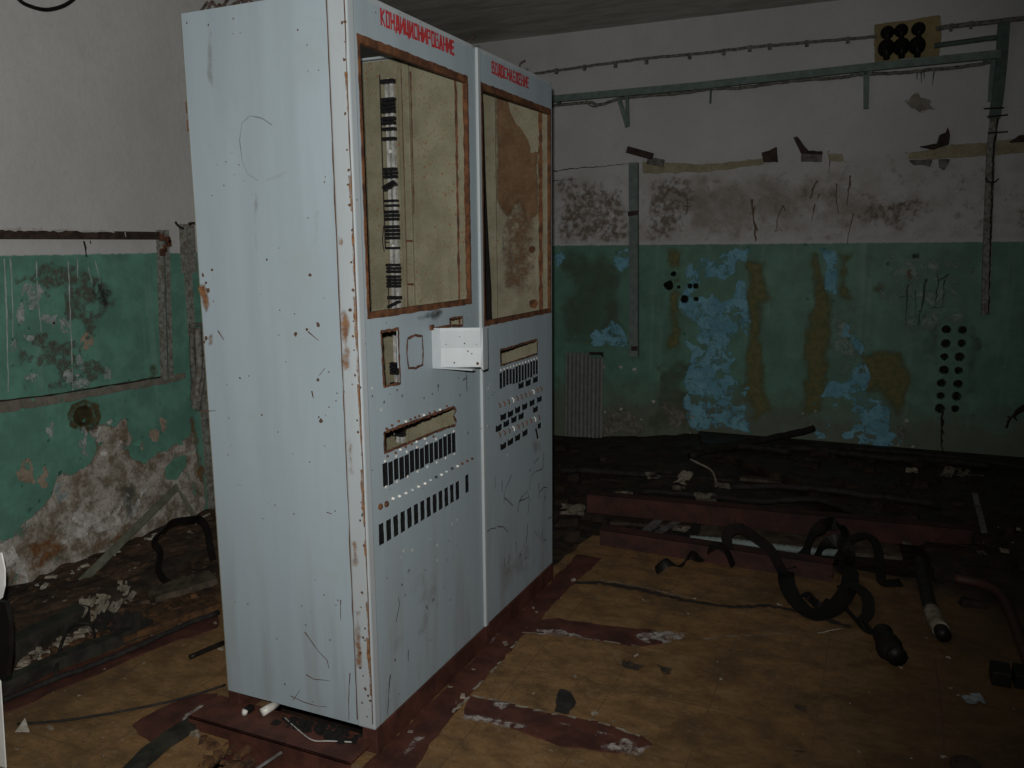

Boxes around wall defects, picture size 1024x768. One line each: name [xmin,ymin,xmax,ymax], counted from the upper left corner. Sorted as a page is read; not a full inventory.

water stain [558,180,626,239]
water stain [651,181,706,234]
peeling [590,321,629,347]
peeling [663,246,770,434]
peeling [801,243,914,448]
spalling [0,373,206,587]